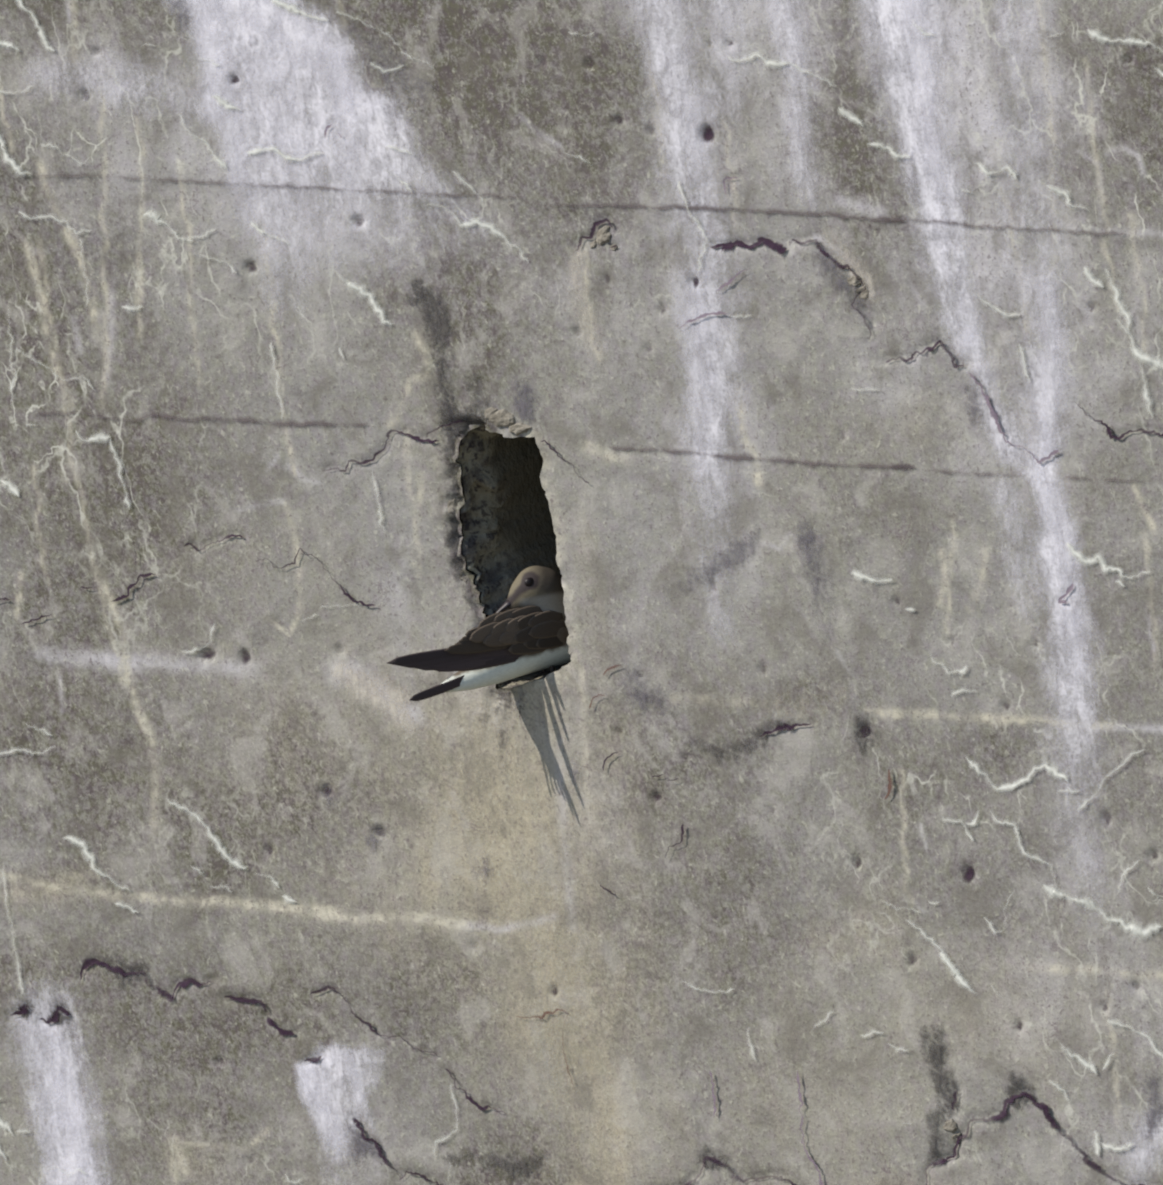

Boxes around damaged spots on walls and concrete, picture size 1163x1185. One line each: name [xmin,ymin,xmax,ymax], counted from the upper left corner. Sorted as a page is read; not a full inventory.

leakage [170,0,433,253]
crack [678,183,871,336]
spalling [485,406,532,436]
crack [886,340,1058,464]
leakage [863,0,1093,762]
crack [1077,268,1163,440]
crack [11,965,70,1024]
crack [80,958,321,1063]
leakage [22,993,102,1185]
leakage [296,1045,382,1159]
crack [352,1118,439,1185]
crack [925,1082,1144,1185]